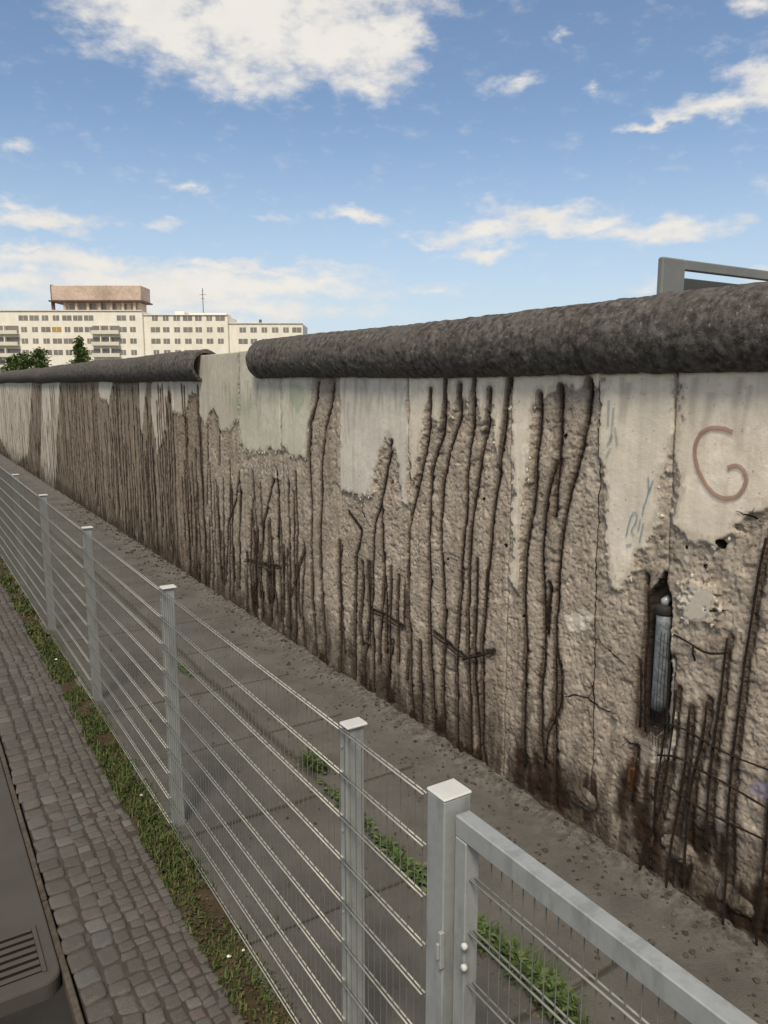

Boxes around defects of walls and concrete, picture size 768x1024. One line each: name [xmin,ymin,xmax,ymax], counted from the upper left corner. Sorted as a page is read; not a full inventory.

crack [565,380,623,779]
spalling [0,353,768,948]
rust [617,765,668,876]
rust [690,822,726,868]
rust [705,882,768,941]